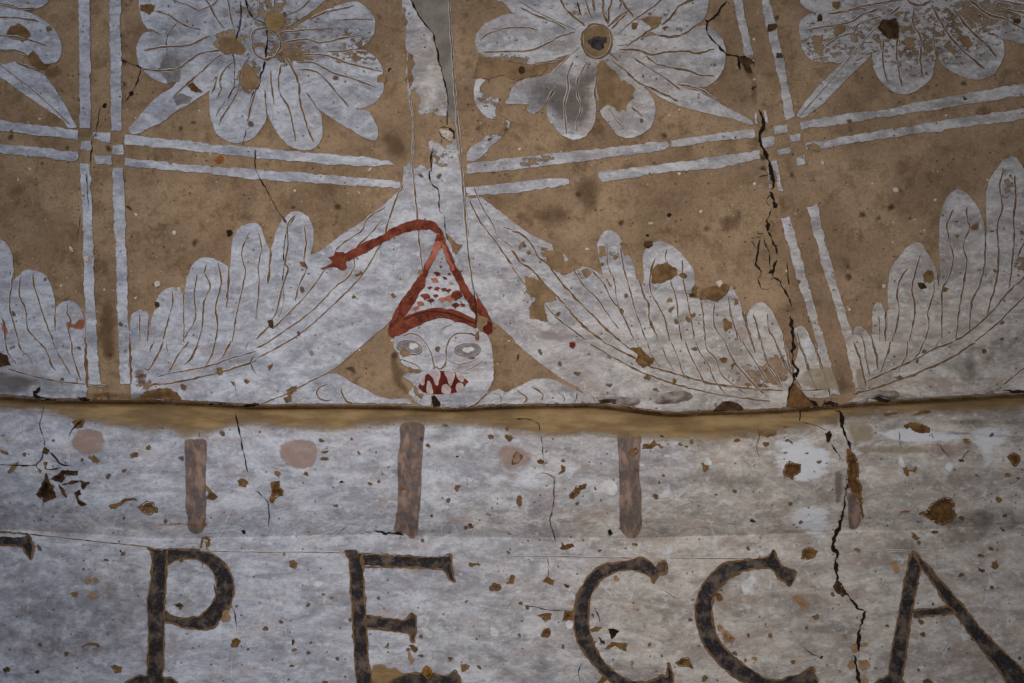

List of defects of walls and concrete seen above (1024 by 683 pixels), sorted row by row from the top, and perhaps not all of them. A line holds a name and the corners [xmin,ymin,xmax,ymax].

crack [706,2,755,69]
spalling [878,18,916,49]
crack [216,0,295,318]
crack [411,0,454,253]
spalling [651,263,738,305]
crack [751,110,851,458]
crack [0,405,68,470]
spalling [36,447,90,506]
spalling [760,426,808,480]
spalling [904,410,931,436]
spalling [912,497,957,540]
crack [831,484,866,683]